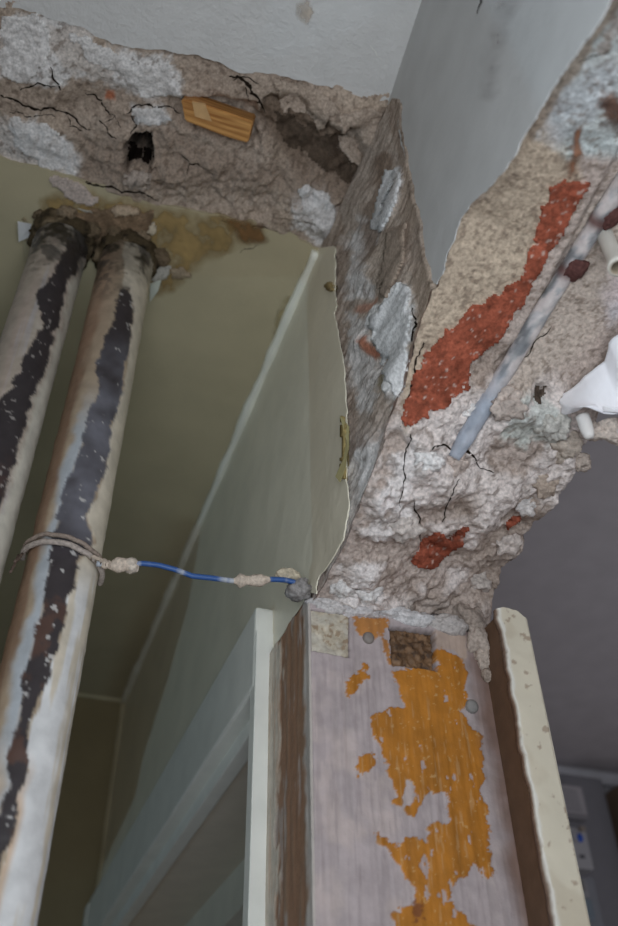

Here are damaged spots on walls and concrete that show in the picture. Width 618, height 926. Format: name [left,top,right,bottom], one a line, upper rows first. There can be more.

crack [0,67,179,139]
crack [229,75,265,112]
damp [142,210,265,291]
spalling [0,0,618,683]
crack [407,308,424,398]
crack [399,420,460,541]
crack [432,444,494,473]